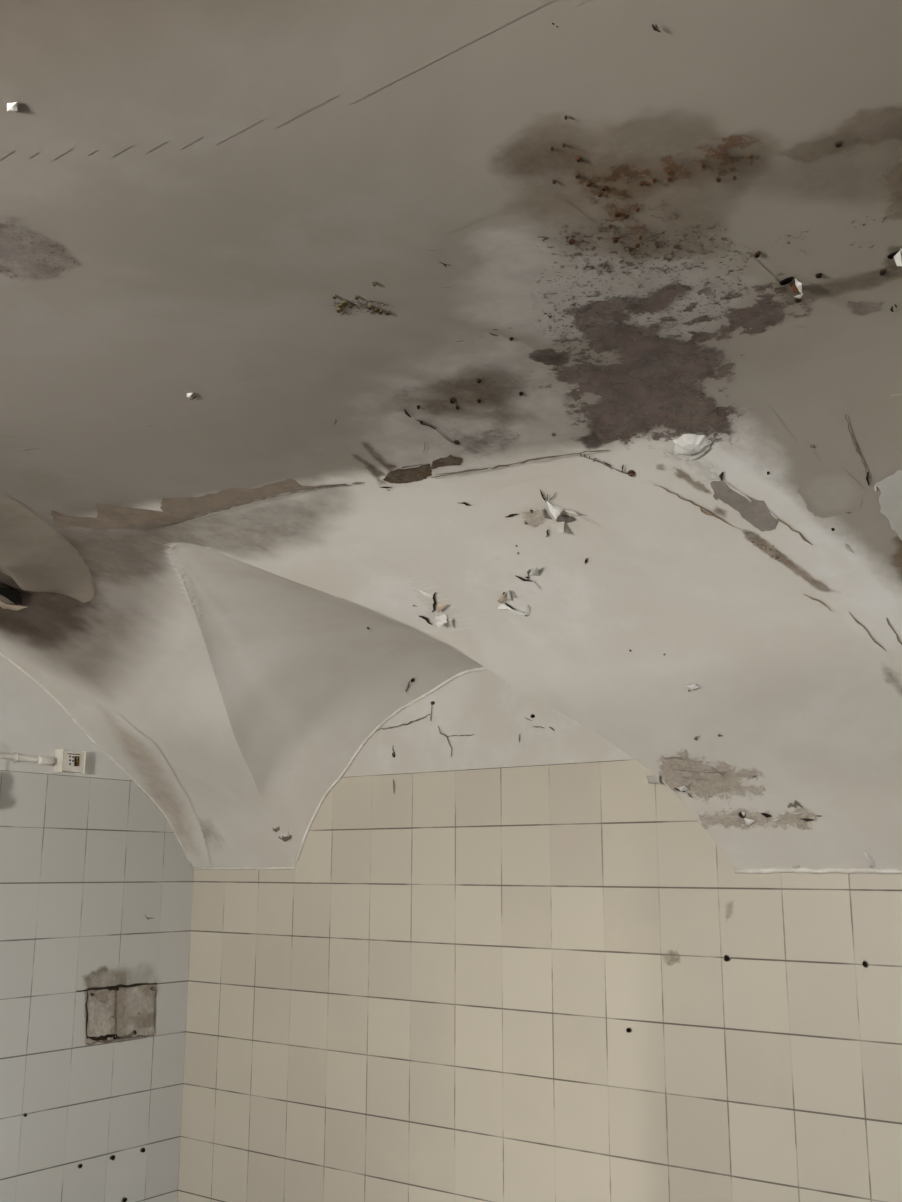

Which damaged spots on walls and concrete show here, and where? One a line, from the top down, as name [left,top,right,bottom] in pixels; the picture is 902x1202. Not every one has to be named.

mould [540,224,751,302]
leakage [788,267,902,315]
leakage [417,374,523,417]
peeling [797,470,902,572]
peeling [331,490,655,679]
flaking render [646,752,822,829]